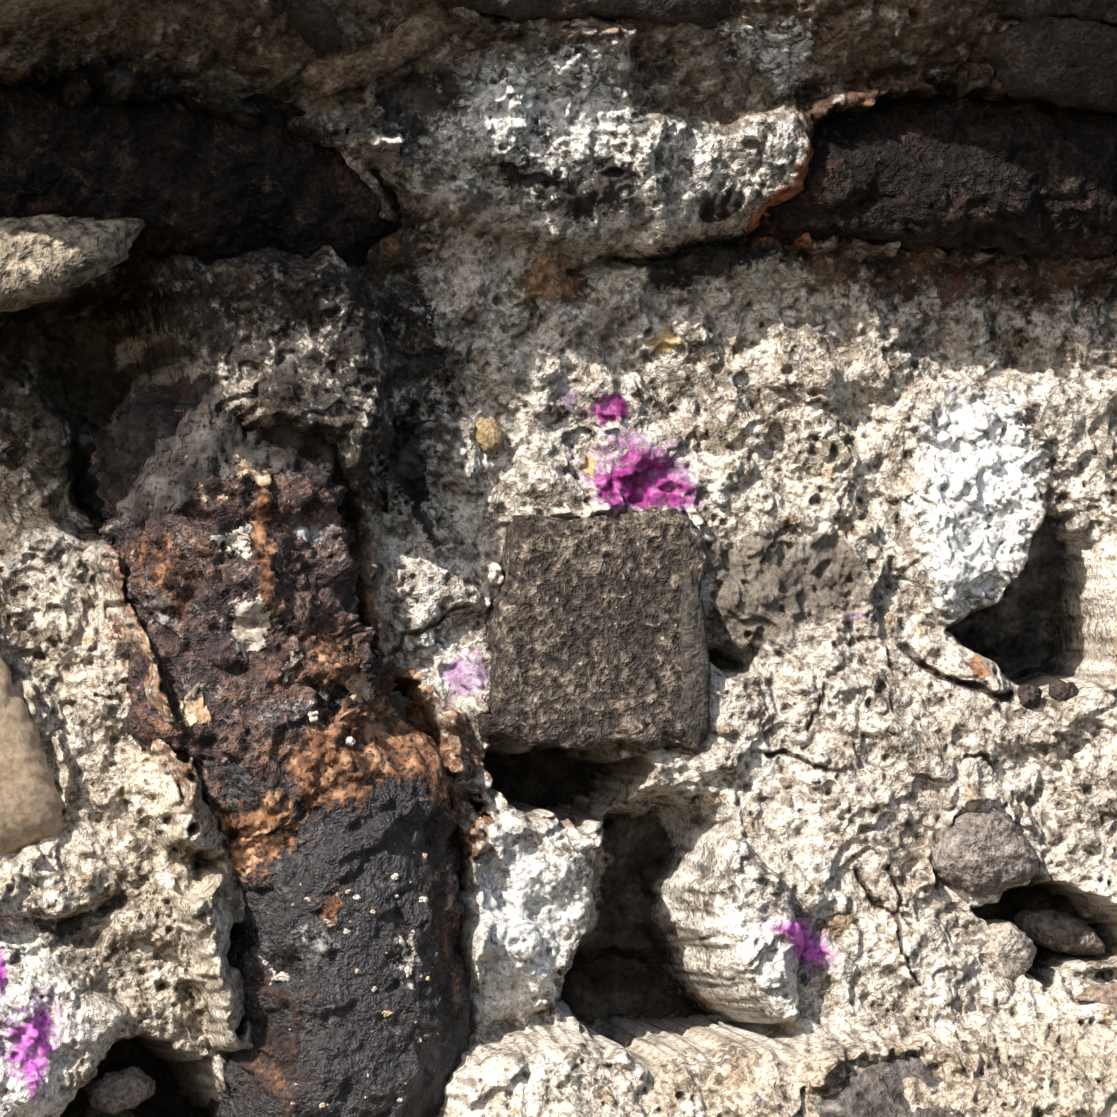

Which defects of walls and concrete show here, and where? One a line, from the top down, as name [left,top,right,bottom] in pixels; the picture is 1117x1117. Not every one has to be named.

rust [744,61,1117,353]
rust [92,376,497,886]
crack [899,648,1015,702]
rust [320,884,343,924]
crack [854,867,921,986]
rust [236,954,306,1115]